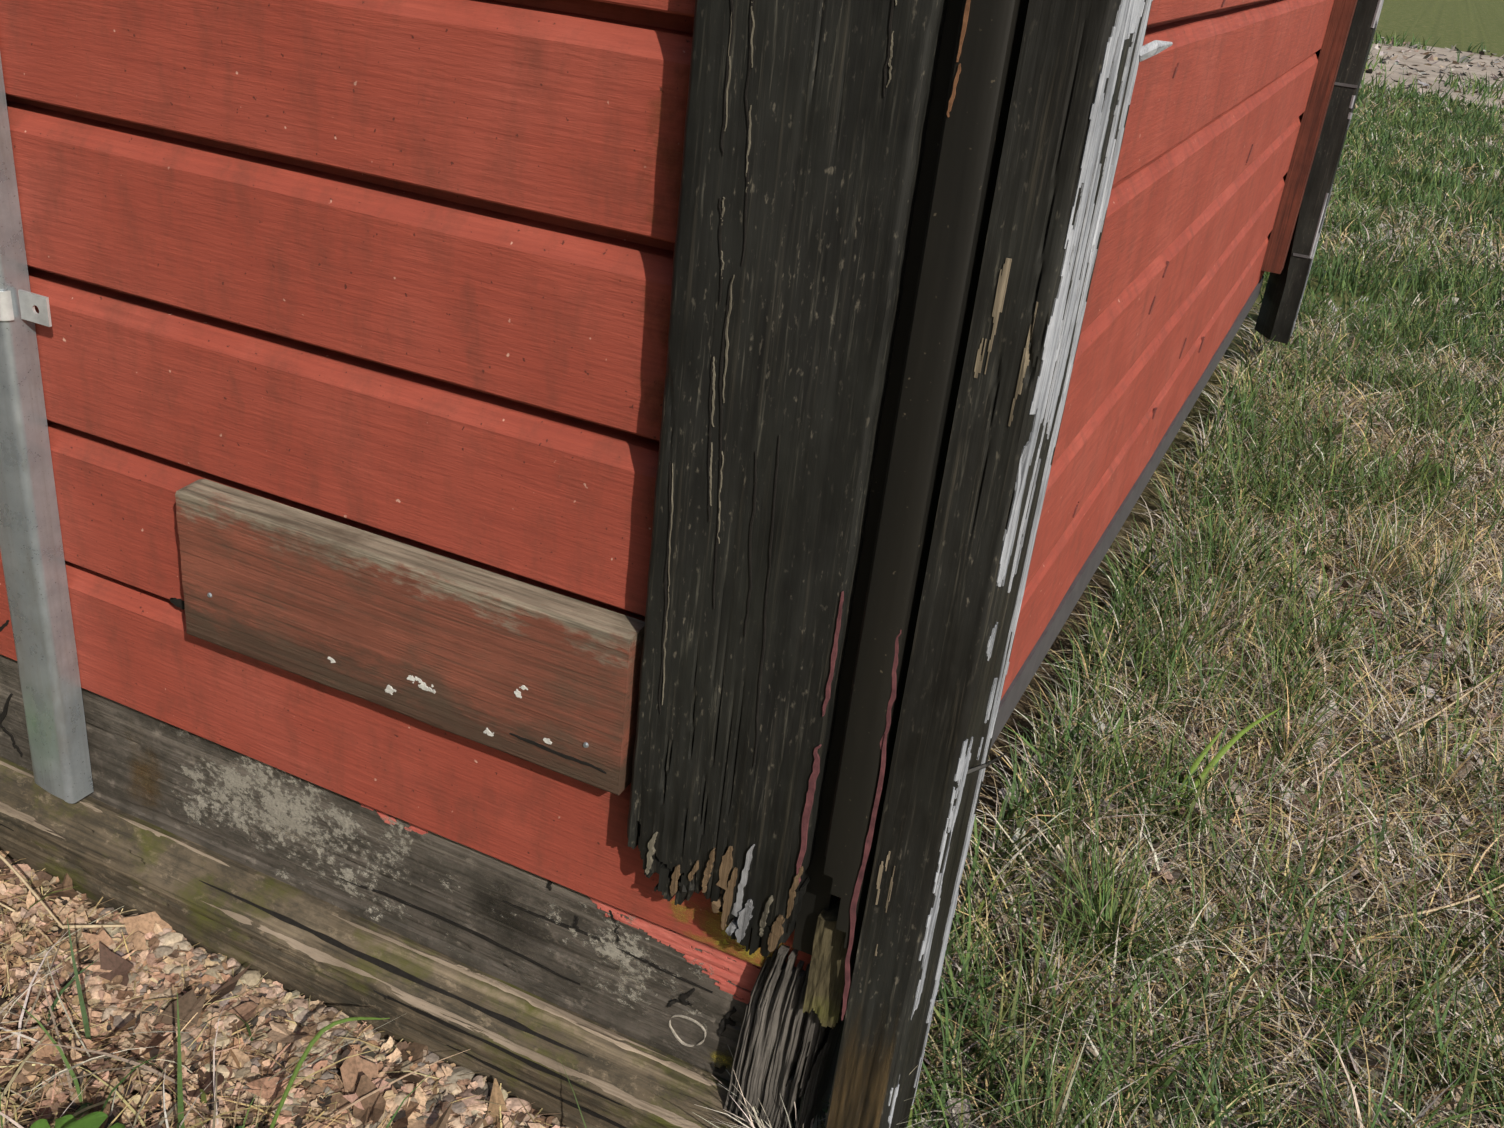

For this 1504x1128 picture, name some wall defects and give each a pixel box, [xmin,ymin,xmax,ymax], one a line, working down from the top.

peeling [888,0,1153,1128]
peeling [385,675,436,695]
leakage [0,760,34,778]
leakage [0,802,67,839]
leakage [78,801,230,867]
peeling [875,851,895,912]
peeling [588,896,762,1004]
leakage [707,913,772,965]
leakage [200,898,728,1128]